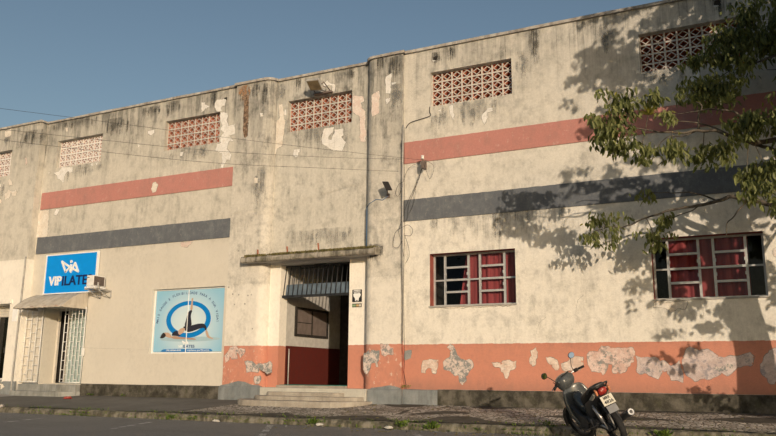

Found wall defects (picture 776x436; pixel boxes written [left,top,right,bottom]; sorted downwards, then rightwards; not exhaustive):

peeling [352,73,396,142]
peeling [201,95,249,168]
peeling [321,127,346,151]
peeling [54,166,73,183]
peeling [224,346,272,384]
peeling [363,343,394,375]
peeling [421,344,474,385]
peeling [491,360,516,379]
peeling [529,345,776,385]